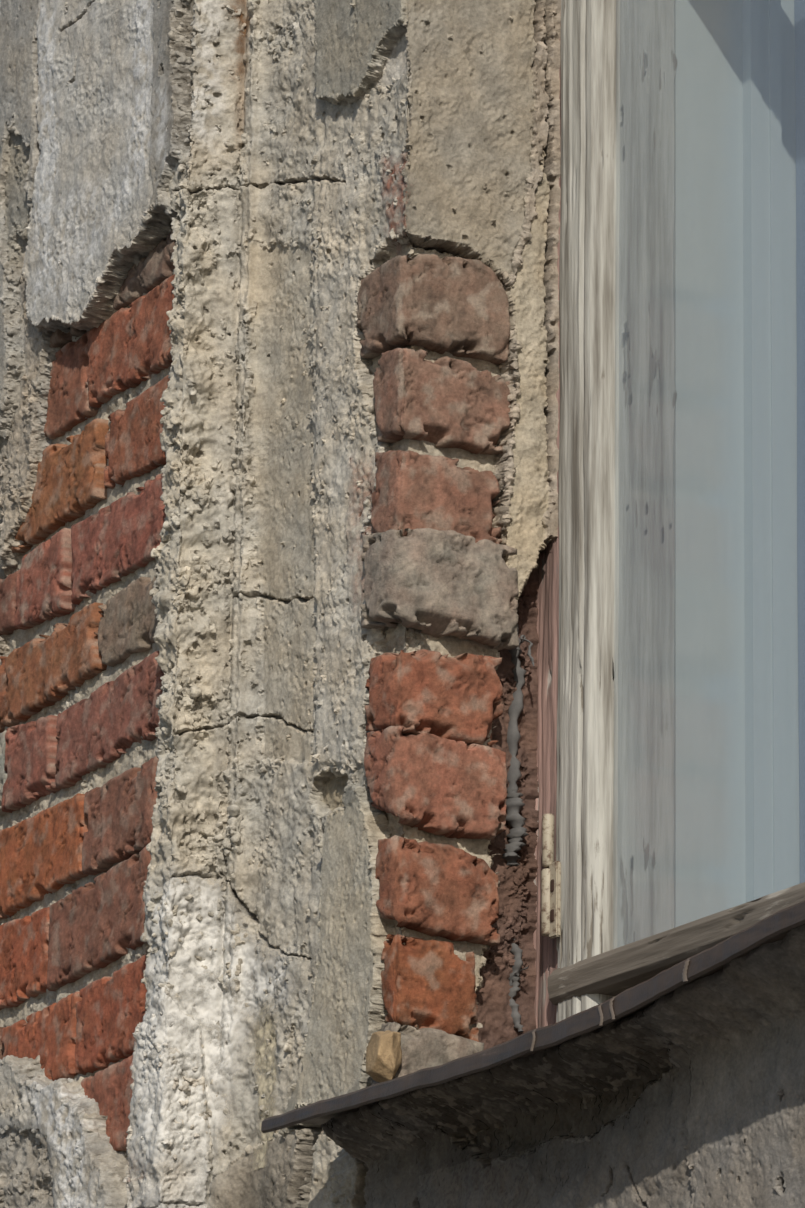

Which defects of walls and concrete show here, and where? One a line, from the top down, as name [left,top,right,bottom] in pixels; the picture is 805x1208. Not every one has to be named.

crack [34,0,95,43]
crack [173,174,346,194]
crack [233,590,314,603]
spalling [0,0,549,1208]
crack [176,711,315,736]
crack [170,869,312,959]
spalling [308,1010,673,1208]